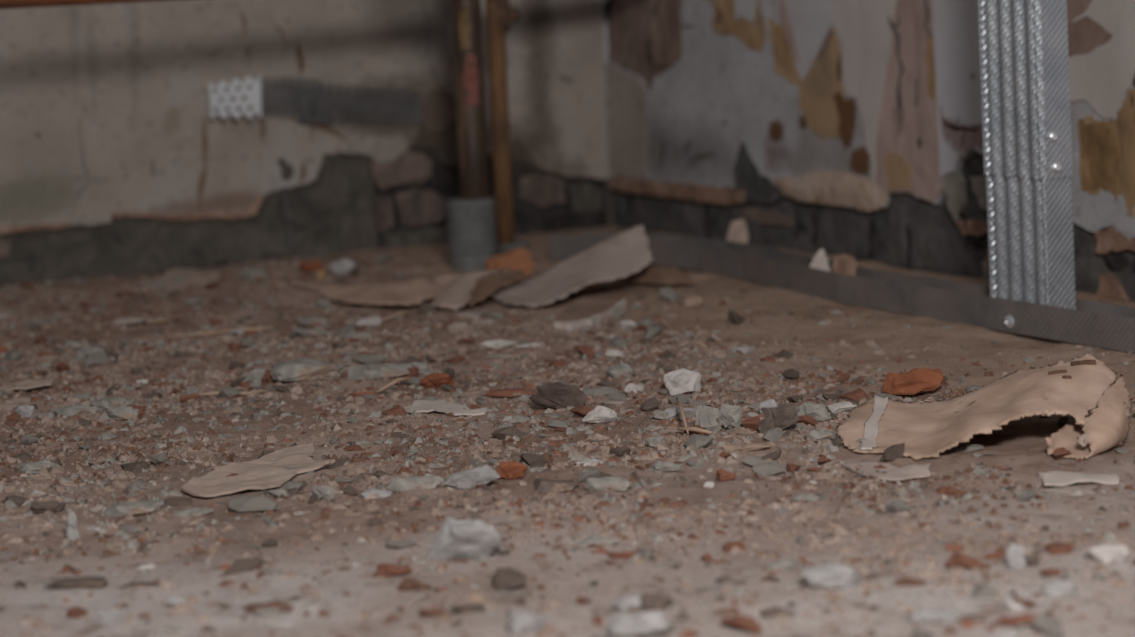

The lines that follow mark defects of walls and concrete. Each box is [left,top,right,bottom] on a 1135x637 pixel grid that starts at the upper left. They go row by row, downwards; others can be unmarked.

flaking render [0,132,460,287]
flaking render [511,0,990,280]
flaking render [1073,215,1135,302]